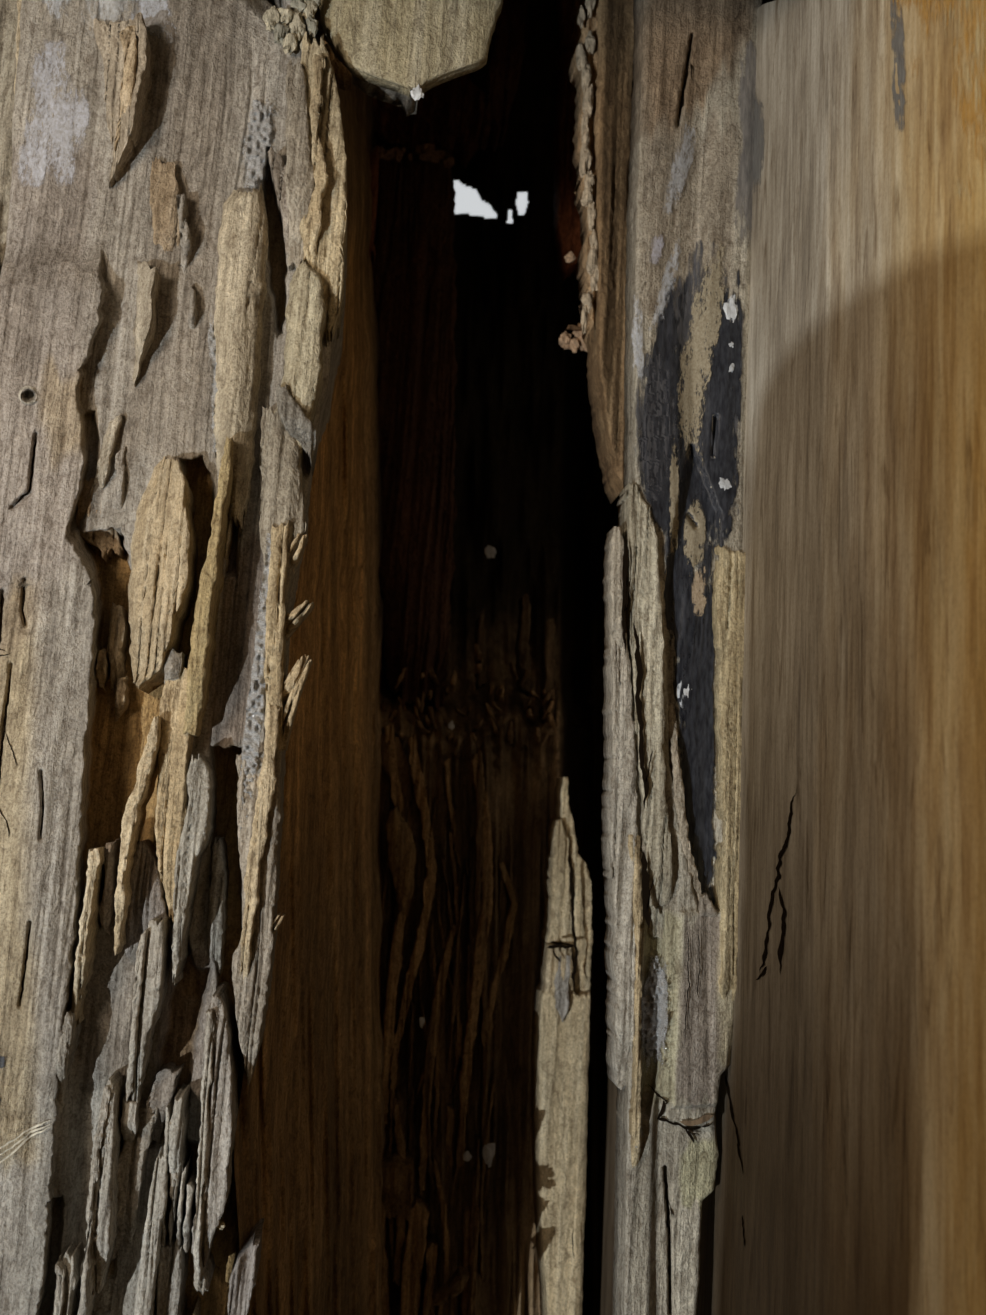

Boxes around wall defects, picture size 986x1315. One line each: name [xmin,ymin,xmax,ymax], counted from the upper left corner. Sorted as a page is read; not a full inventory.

peeling [0,0,22,275]
peeling [89,12,153,188]
peeling [76,414,198,694]
peeling [132,261,161,387]
peeling [150,157,198,330]
peeling [213,184,271,529]
peeling [276,383,317,476]
peeling [719,477,732,491]
peeling [723,294,738,323]
peeling [676,682,692,708]
crack [756,789,797,980]
peeling [227,1218,264,1315]